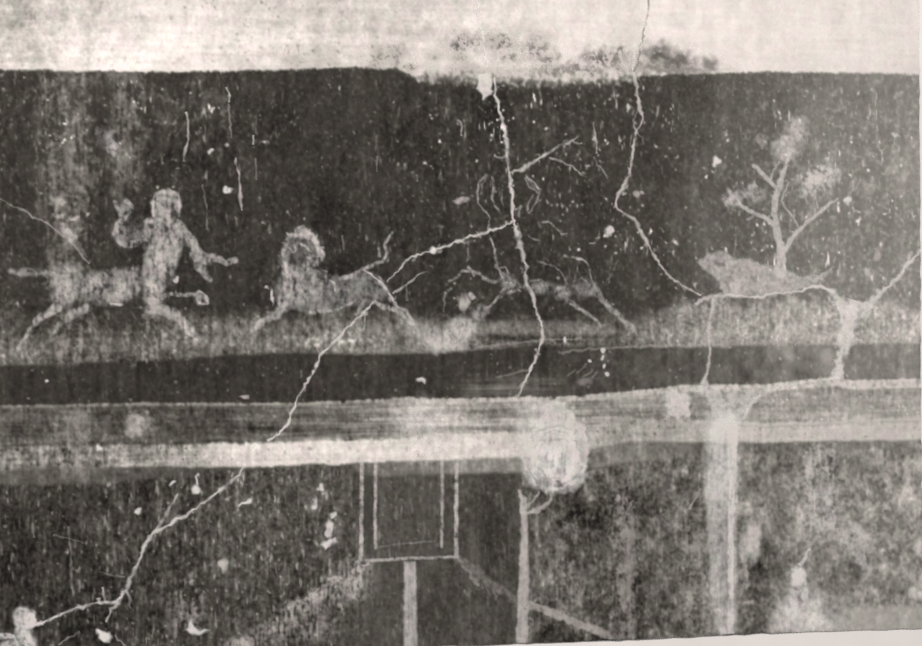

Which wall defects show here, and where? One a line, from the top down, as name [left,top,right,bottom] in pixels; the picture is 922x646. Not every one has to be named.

crack [135,468,243,568]
crack [267,307,370,441]
crack [399,4,544,384]
crack [615,71,921,380]